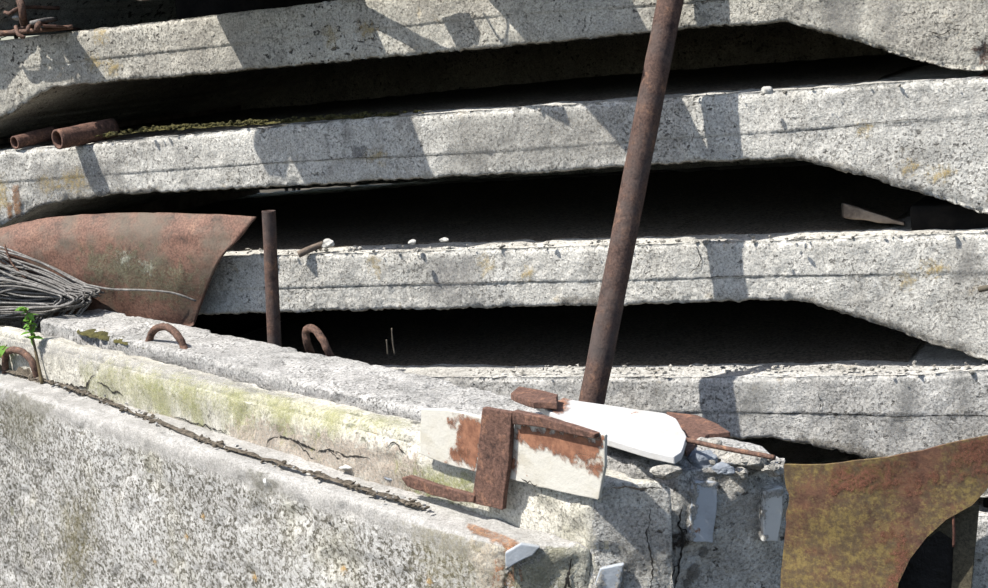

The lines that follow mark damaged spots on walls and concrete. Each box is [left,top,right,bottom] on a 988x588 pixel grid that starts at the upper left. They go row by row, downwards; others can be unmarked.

crack [66,375,121,394]
crack [176,417,225,434]
crack [266,435,405,459]
crack [611,486,687,588]
corrosion [467,524,522,588]